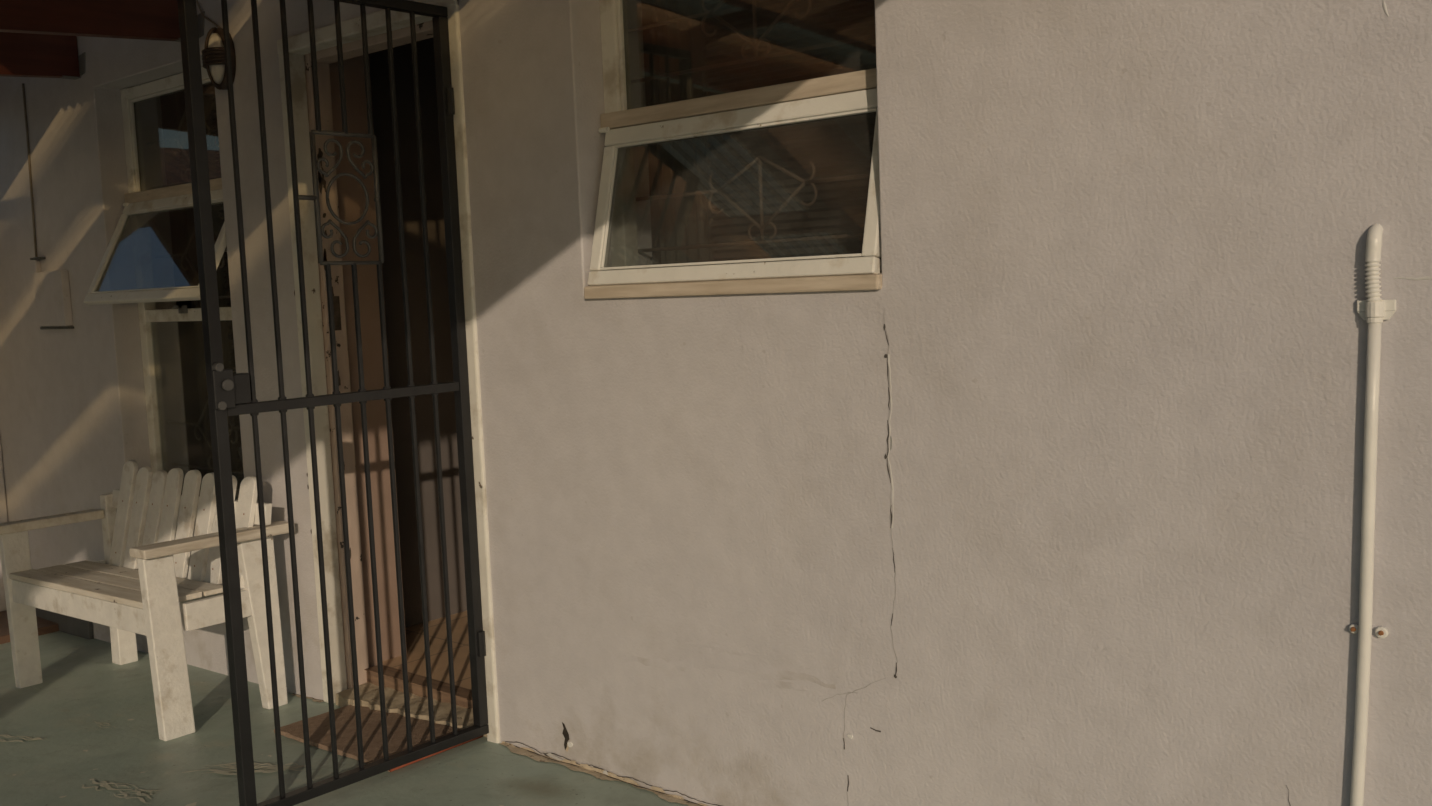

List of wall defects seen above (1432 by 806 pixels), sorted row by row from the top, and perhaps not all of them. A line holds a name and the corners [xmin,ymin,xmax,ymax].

peeling [500,722,721,806]
crack [823,308,898,799]